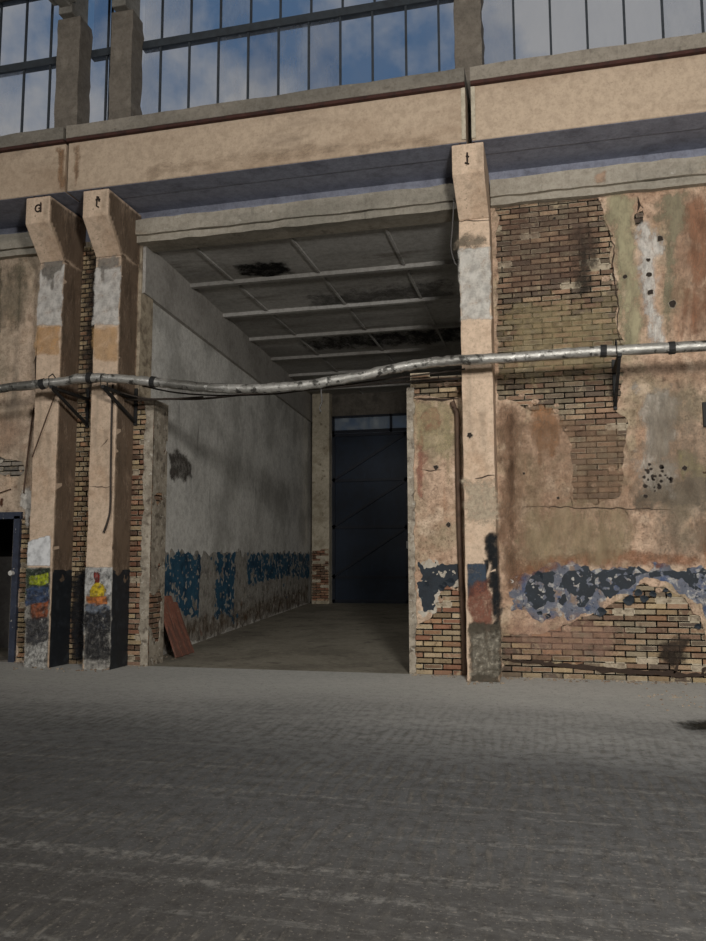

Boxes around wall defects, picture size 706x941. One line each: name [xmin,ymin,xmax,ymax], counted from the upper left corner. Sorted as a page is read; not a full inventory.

spalling [490,198,628,506]
peeling [138,400,329,666]
spalling [406,372,462,675]
spalling [501,560,706,683]